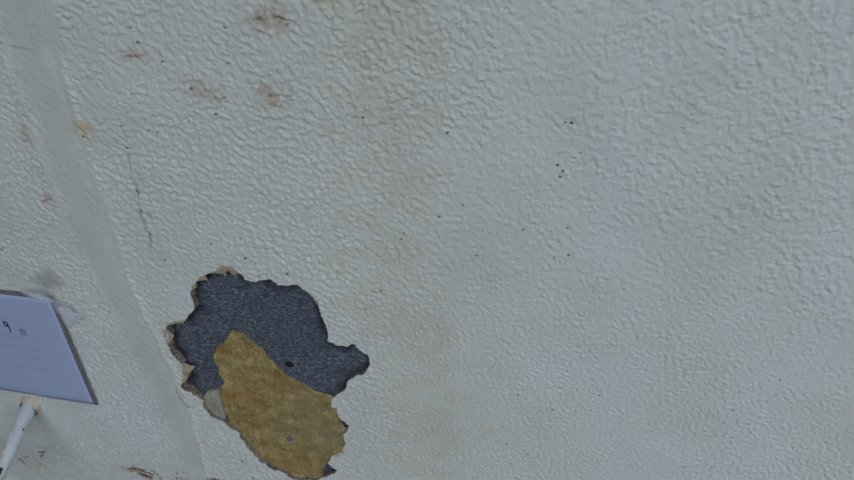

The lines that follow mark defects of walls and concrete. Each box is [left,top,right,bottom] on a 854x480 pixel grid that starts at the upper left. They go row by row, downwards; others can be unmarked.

crack [111,124,155,253]
peeling [163,265,370,480]